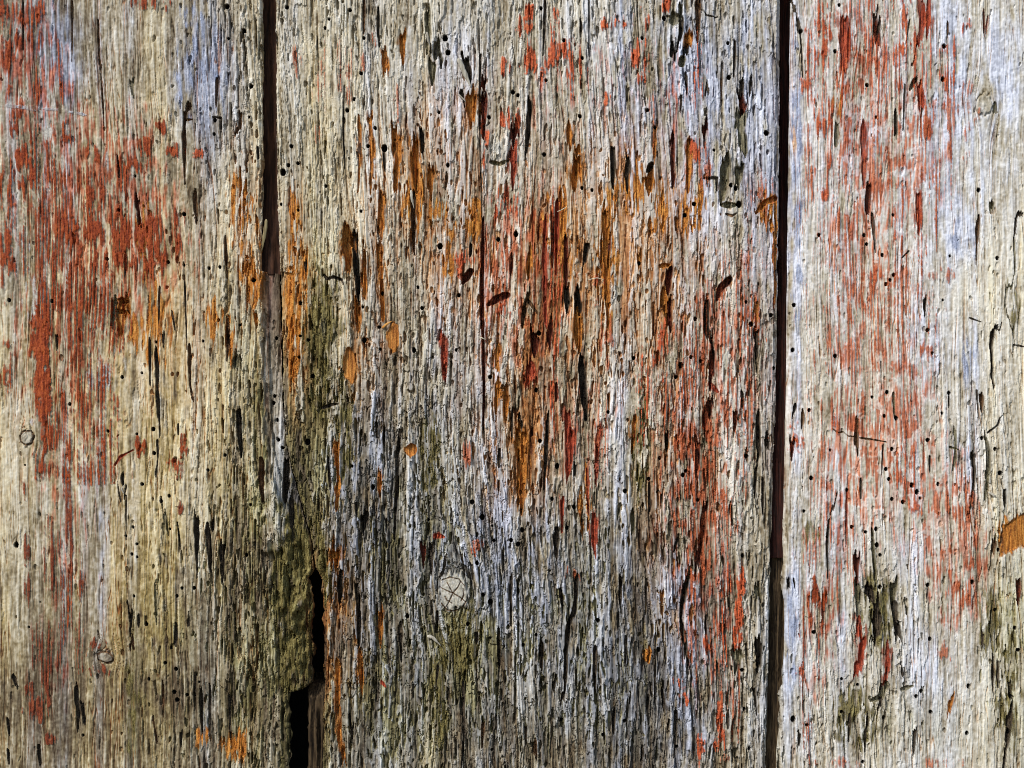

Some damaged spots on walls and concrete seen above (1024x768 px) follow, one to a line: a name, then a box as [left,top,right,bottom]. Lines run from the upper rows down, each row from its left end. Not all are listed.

hole [610,146,631,194]
peeling [0,0,203,768]
spalling [226,316,242,370]
spalling [439,330,448,384]
spalling [453,51,614,559]
peeling [628,74,777,768]
spalling [786,0,998,765]
spalling [393,429,417,540]
spalling [420,532,445,575]
spalling [617,503,635,534]
spalling [552,523,580,706]